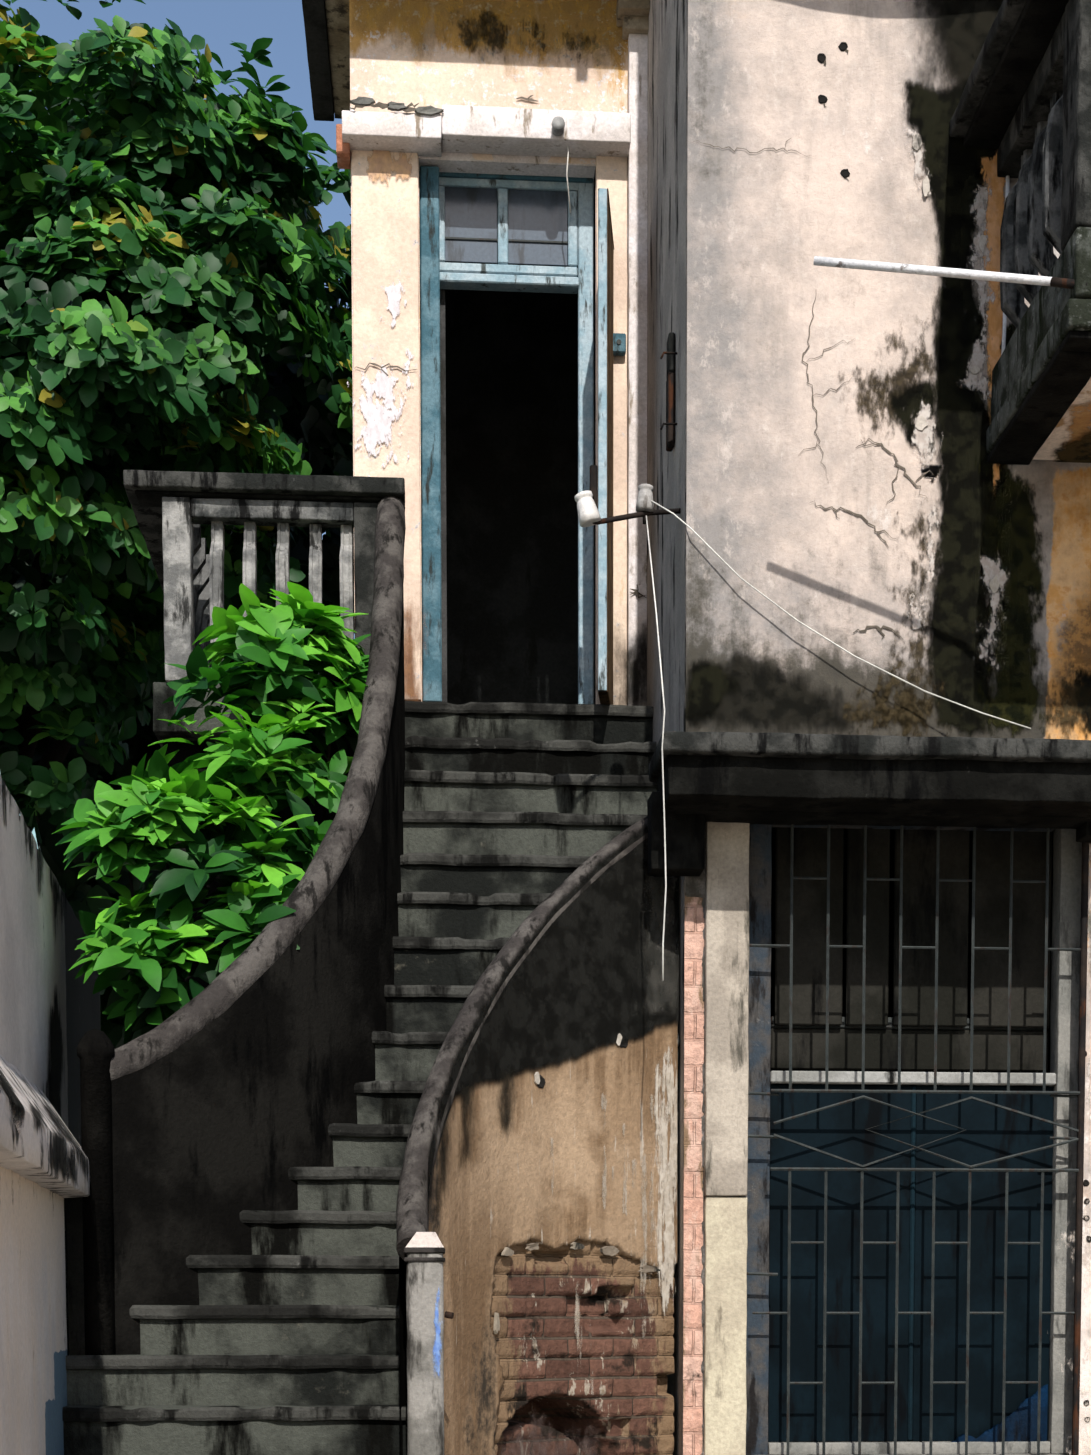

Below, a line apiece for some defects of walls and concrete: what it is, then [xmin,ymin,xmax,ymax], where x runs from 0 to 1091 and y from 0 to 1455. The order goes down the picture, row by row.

water stain [356,0,621,60]
peeling [379,280,407,327]
peeling [347,349,414,477]
water stain [685,57,1016,736]
crack [802,297,934,548]
water stain [1054,431,1091,463]
water stain [615,628,647,706]
crack [853,625,903,640]
water stain [428,825,679,1213]
water stain [0,986,90,1187]
flaking render [490,896,704,1455]
peeling [1079,1388,1091,1455]